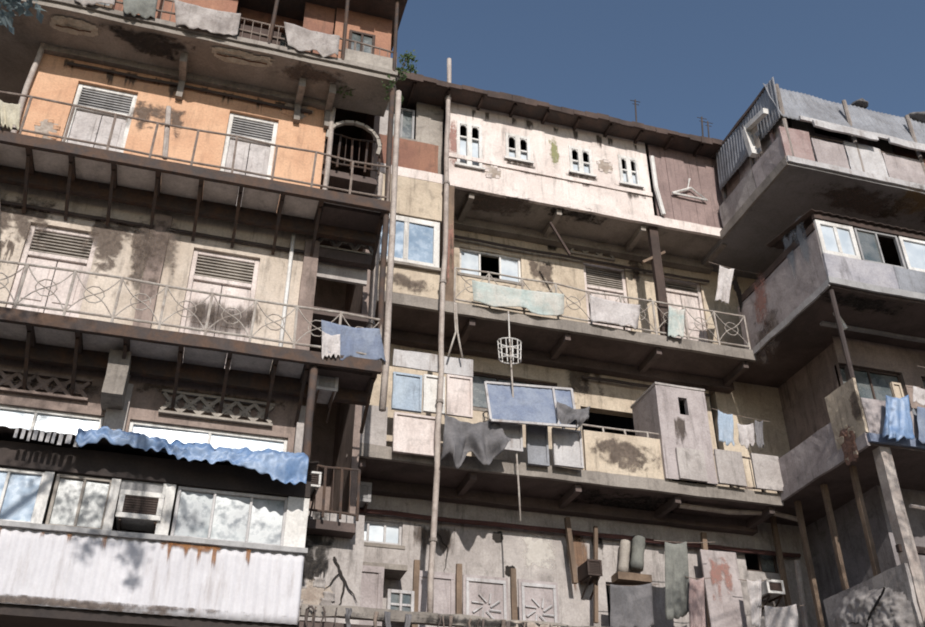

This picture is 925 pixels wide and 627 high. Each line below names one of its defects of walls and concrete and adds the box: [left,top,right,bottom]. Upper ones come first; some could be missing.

leakage [99,25,194,61]
leakage [0,199,55,261]
leakage [83,219,178,284]
leakage [385,273,426,292]
leakage [529,260,553,288]
leakage [592,438,647,472]
rust [162,542,220,563]
leakage [303,534,334,580]
crack [324,556,357,605]
crack [849,587,885,627]